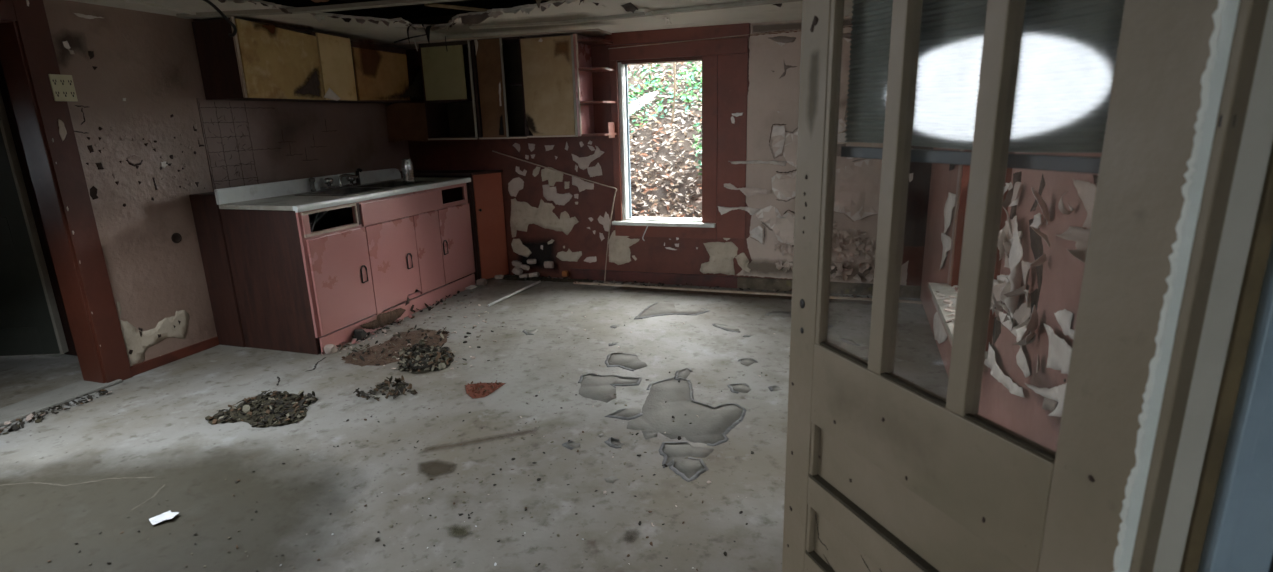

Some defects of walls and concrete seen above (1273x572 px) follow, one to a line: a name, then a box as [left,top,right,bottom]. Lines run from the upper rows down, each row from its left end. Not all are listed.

peeling [117,302,189,366]
peeling [508,141,640,265]
peeling [696,238,751,275]
peeling [718,111,808,272]
peeling [830,106,882,283]
peeling [984,171,1090,417]